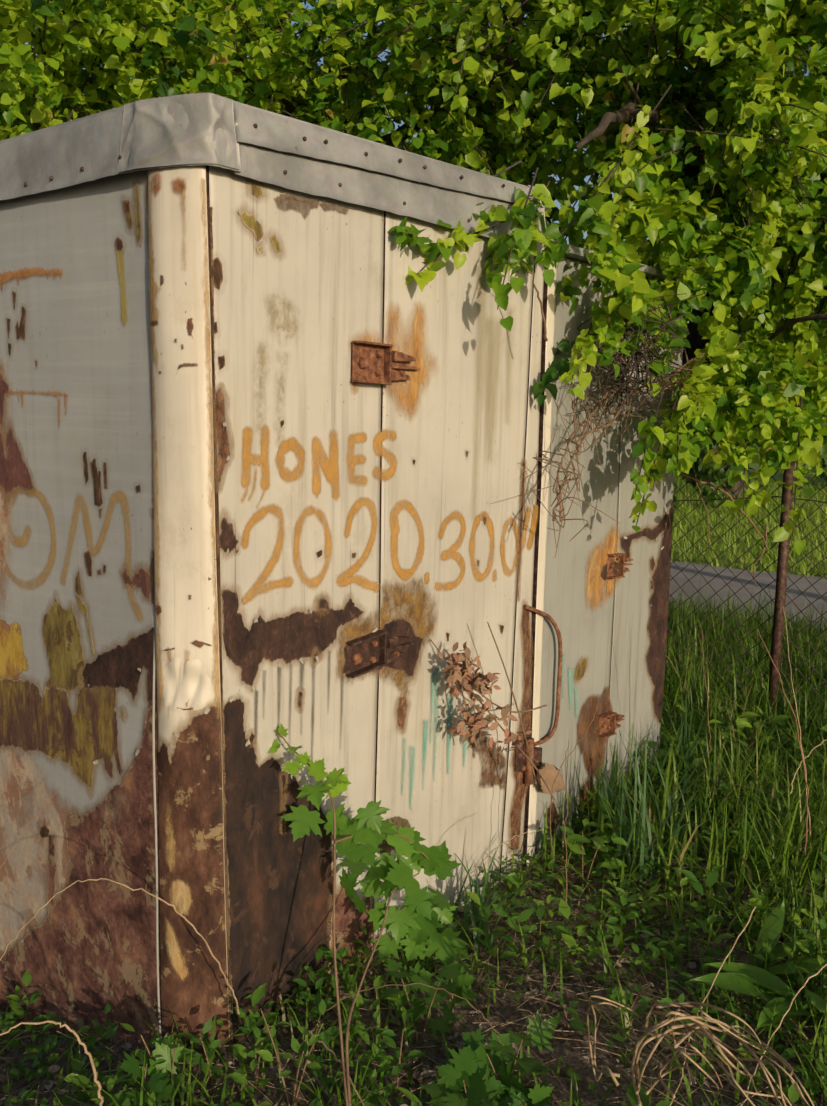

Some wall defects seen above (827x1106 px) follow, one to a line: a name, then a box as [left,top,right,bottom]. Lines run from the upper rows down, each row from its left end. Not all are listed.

peeling [7,291,26,355]
corrosion [388,306,430,415]
peeling [0,369,33,494]
corrosion [0,174,373,1051]
peeling [222,589,364,691]
corrosion [338,581,436,730]
corrosion [586,530,619,607]
corrosion [578,688,612,826]
corrosion [545,802,560,836]